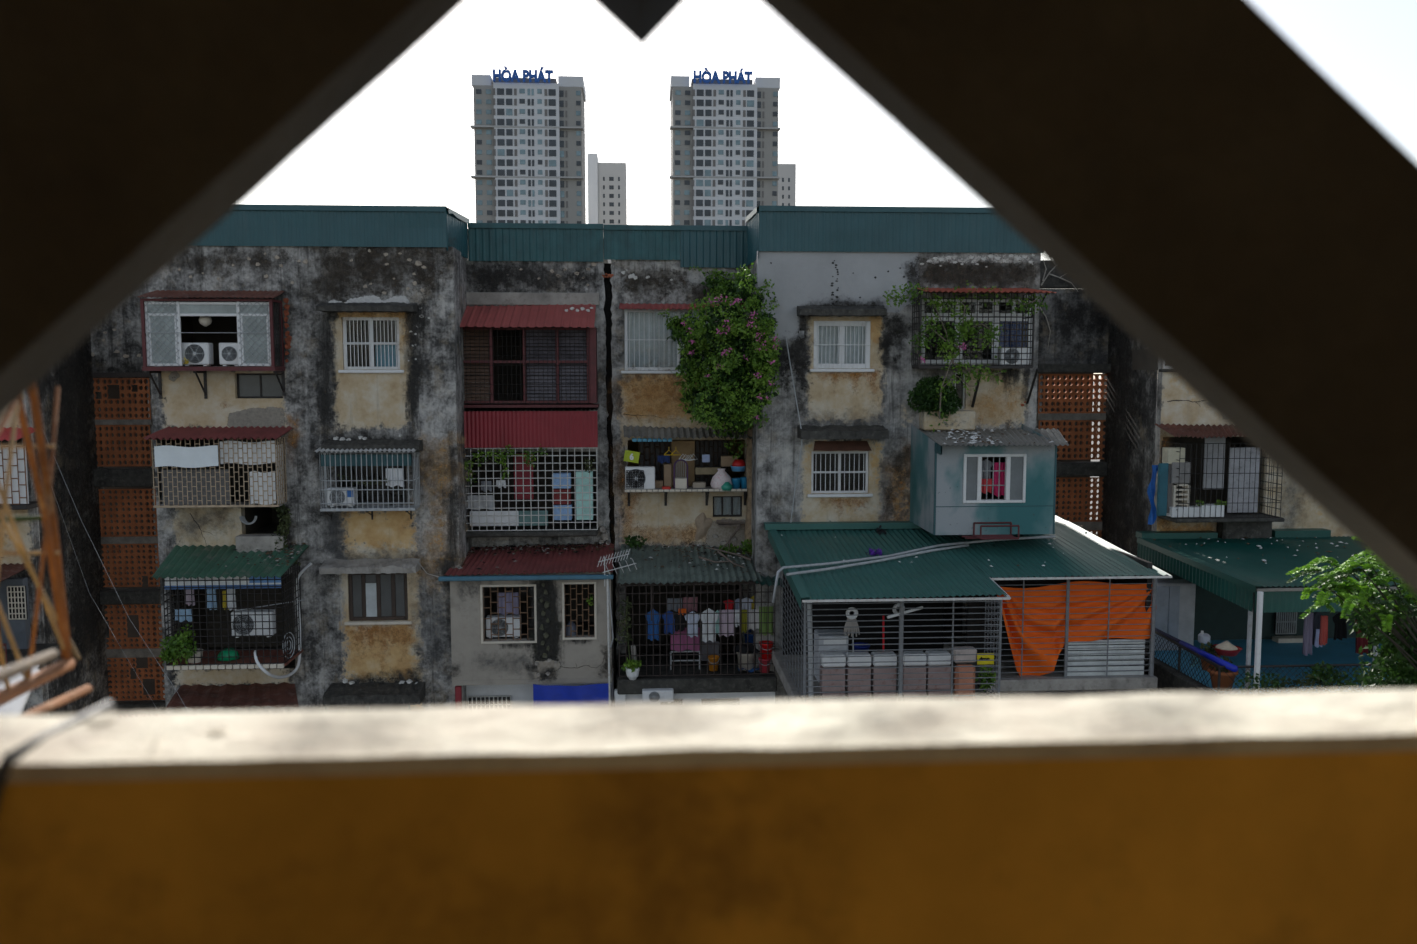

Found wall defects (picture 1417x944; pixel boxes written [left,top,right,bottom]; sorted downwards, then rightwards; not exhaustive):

mould [177,250,289,276]
water stain [290,246,454,497]
water stain [440,490,460,576]
water stain [469,262,599,293]
crack [560,262,661,691]
water stain [773,260,914,411]
water stain [874,257,1037,305]
water stain [988,297,1148,559]